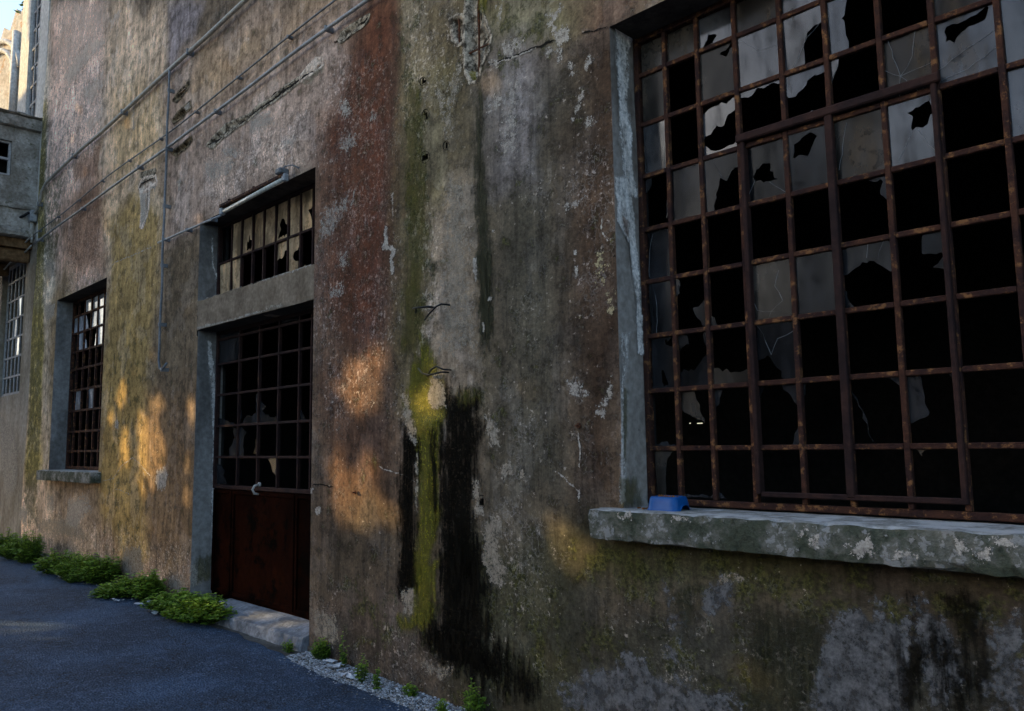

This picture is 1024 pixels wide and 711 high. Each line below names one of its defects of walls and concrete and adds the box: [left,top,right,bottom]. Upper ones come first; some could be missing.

flaking render [334,13,370,44]
spalling [448,0,492,85]
crack [488,39,555,67]
flaking render [171,79,192,124]
flaking render [171,135,193,157]
flaking render [138,168,158,229]
peeling [595,29,644,521]
peeling [568,381,589,398]
water stain [395,384,542,706]
spalling [843,536,875,559]
spalling [954,536,1018,564]
water stain [891,588,991,711]